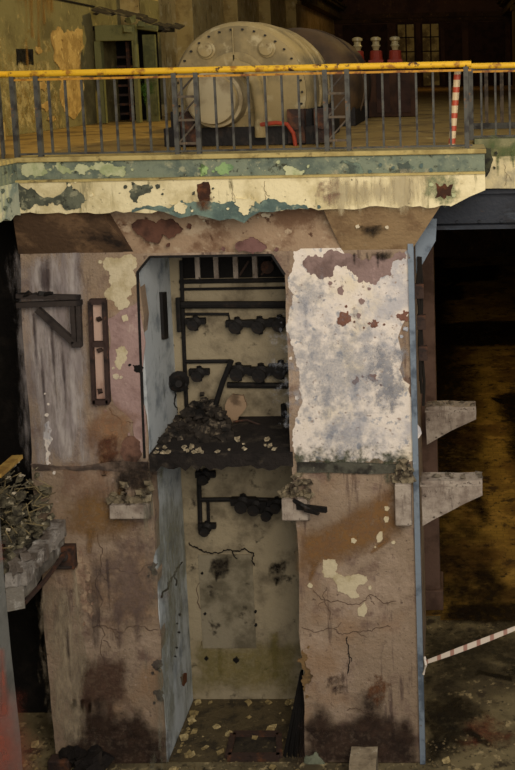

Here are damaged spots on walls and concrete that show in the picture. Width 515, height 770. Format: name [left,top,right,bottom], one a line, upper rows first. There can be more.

spalling [50,26,85,120]
peeling [0,160,321,247]
peeling [98,254,146,453]
peeling [286,248,422,484]
damp [42,555,167,763]
crack [160,542,255,598]
peeling [322,559,372,617]
crack [302,587,394,674]
damp [305,695,417,763]